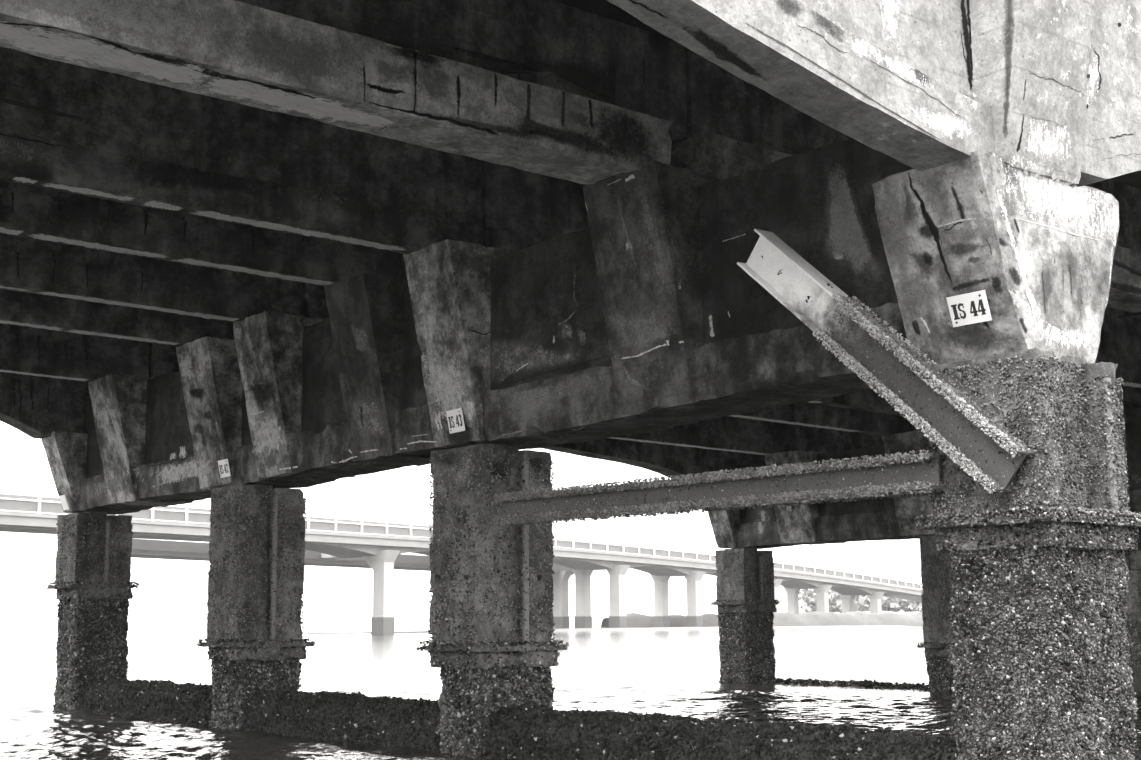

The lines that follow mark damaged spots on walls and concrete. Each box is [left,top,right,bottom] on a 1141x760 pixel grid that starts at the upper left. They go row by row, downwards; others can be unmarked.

crack [0,22,329,102]
crack [367,84,499,136]
crack [747,23,968,141]
water stain [906,105,973,139]
crack [960,0,973,89]
crack [1097,134,1141,161]
crack [908,173,952,283]